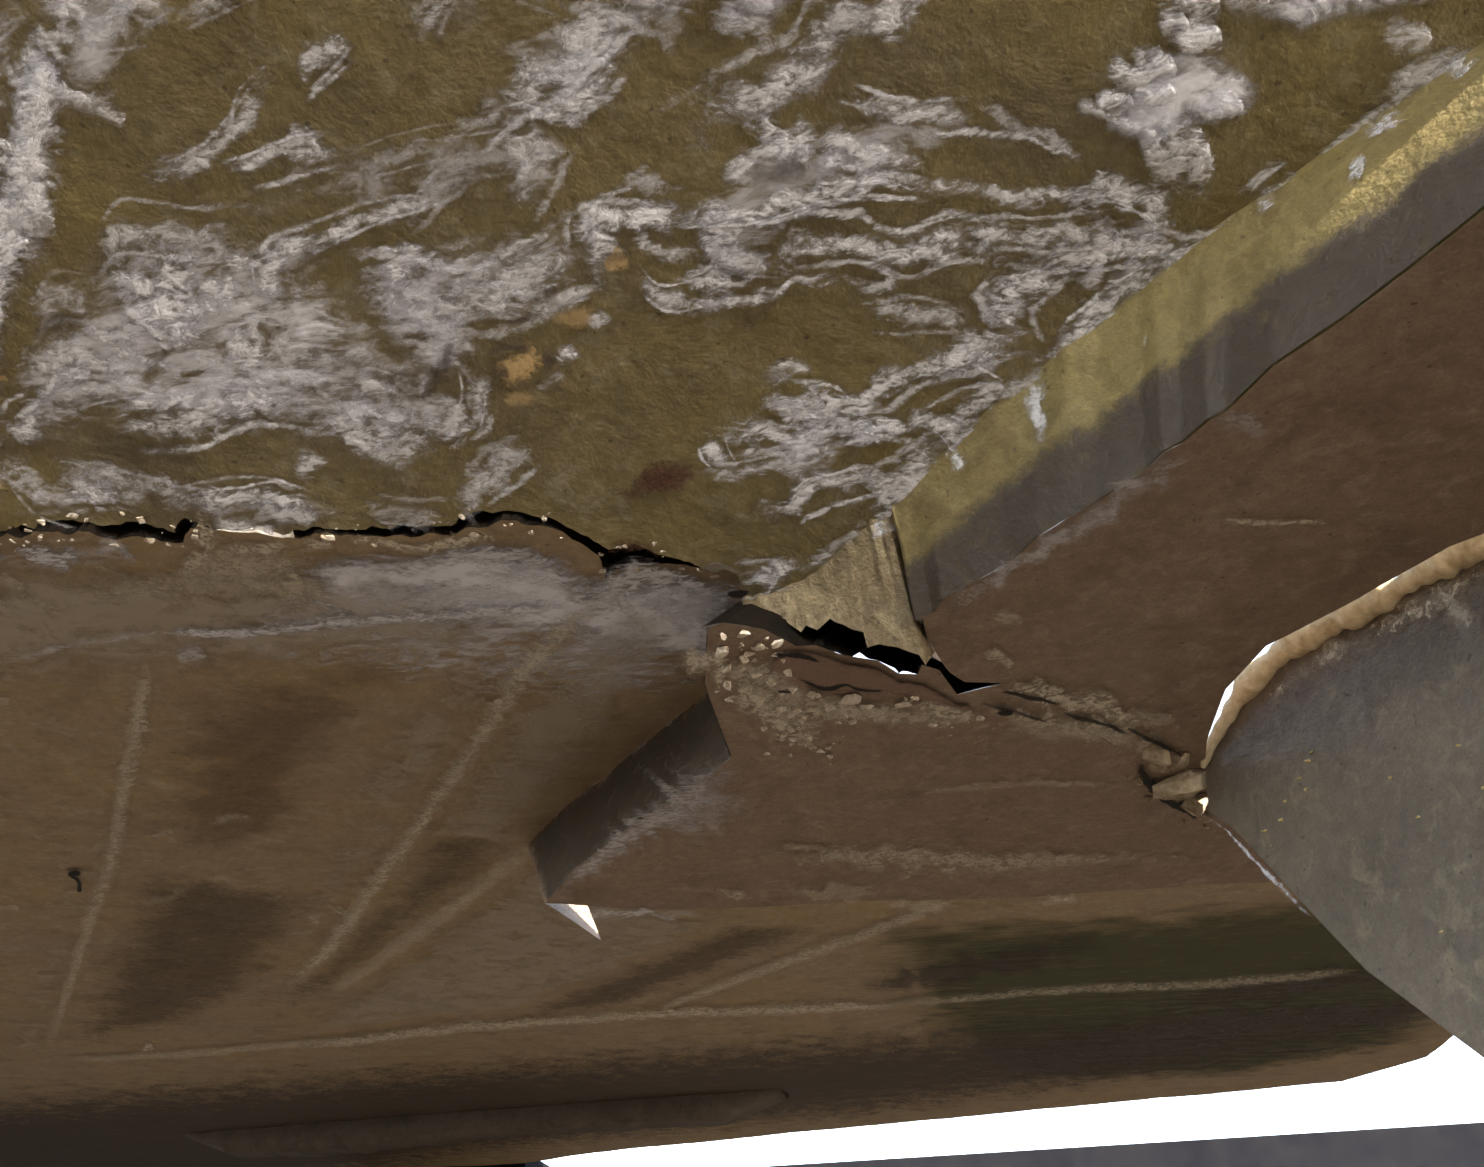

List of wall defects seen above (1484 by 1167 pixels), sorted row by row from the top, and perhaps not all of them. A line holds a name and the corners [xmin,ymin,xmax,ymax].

water stain [1267,0,1397,24]
water stain [0,0,134,322]
water stain [181,99,327,188]
water stain [3,197,487,461]
water stain [368,0,1251,533]
water stain [905,127,1484,635]
crack [0,512,200,552]
crack [293,509,719,578]
crack [773,653,881,693]
spalling [703,590,1001,765]
crack [983,691,1197,819]
spalling [1125,743,1214,829]